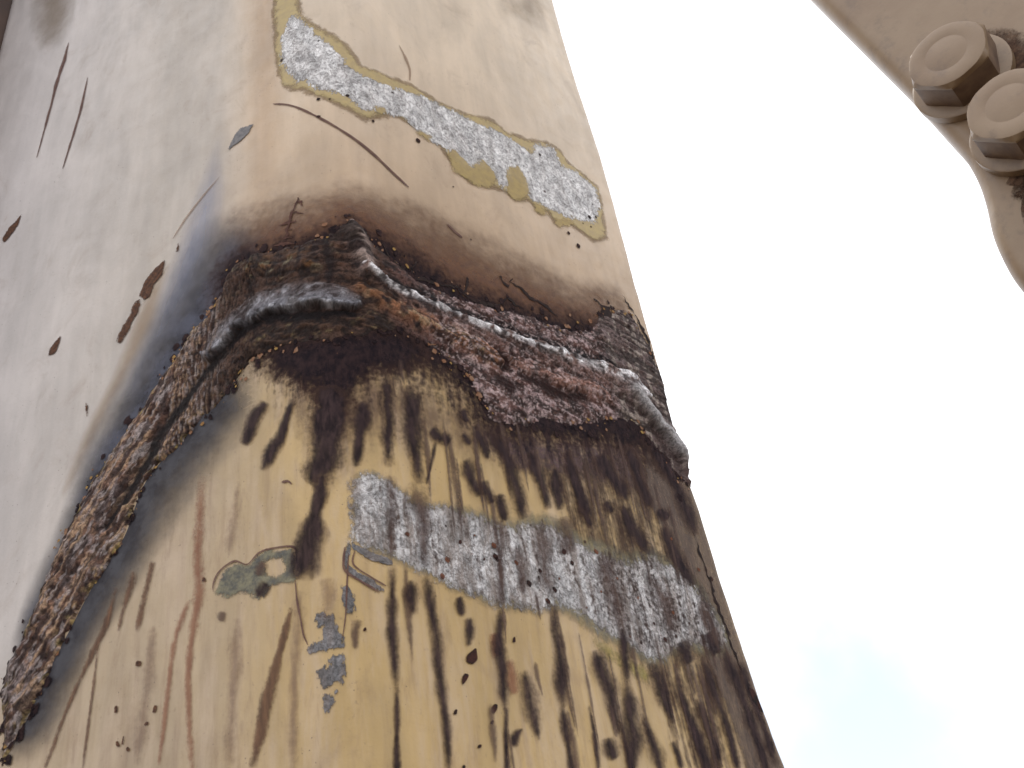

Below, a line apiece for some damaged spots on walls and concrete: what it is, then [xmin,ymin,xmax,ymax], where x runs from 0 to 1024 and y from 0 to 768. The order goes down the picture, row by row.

peeling [275,0,606,248]
rust [159,501,203,760]
leakage [0,197,696,768]
peeling [202,472,729,713]
crack [692,531,741,669]